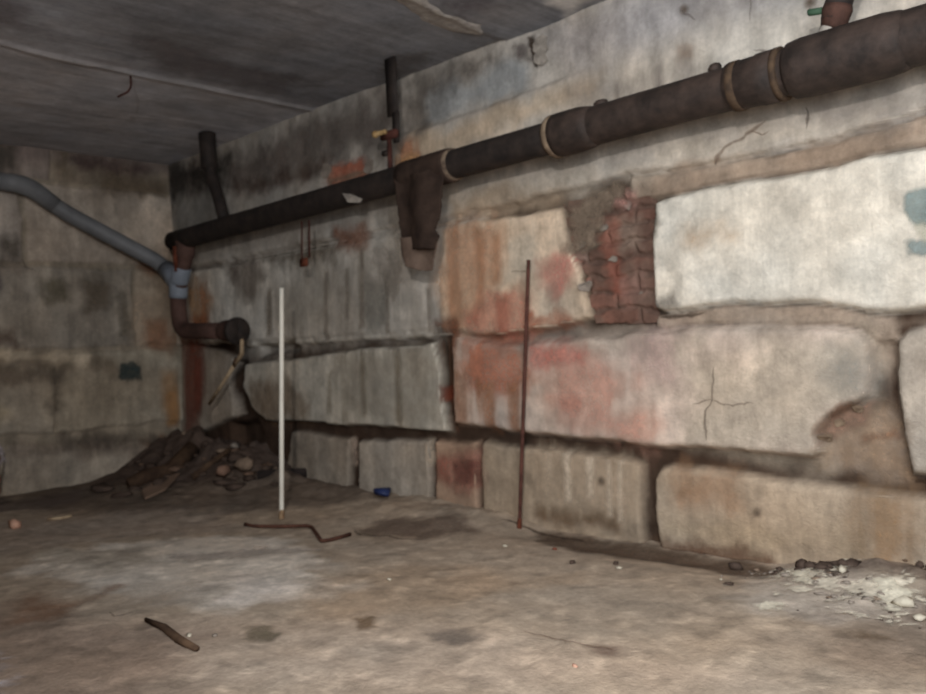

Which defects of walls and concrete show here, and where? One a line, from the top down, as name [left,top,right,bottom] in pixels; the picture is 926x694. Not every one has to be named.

spalling [563,181,675,324]
rust [182,339,205,431]
rust [436,292,532,430]
damp [505,519,926,625]